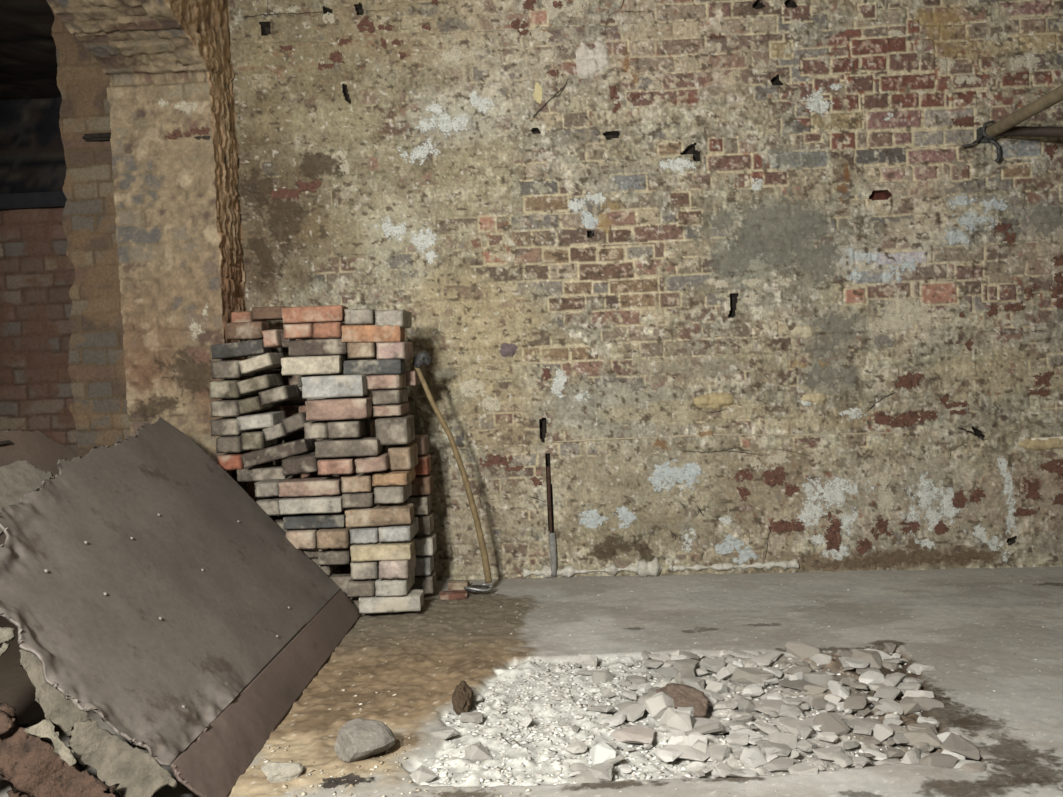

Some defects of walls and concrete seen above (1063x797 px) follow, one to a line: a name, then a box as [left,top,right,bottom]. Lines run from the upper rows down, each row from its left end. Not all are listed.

spalling [510,0,591,57]
leakage [398,88,504,166]
spalling [603,131,620,140]
peeling [659,143,701,173]
spalling [869,190,892,200]
peeling [695,189,842,318]
spalling [732,451,800,501]
spalling [1013,459,1063,517]
leakage [681,528,696,552]
spalling [824,508,846,552]
spalling [856,518,951,555]
leakage [795,457,1018,570]